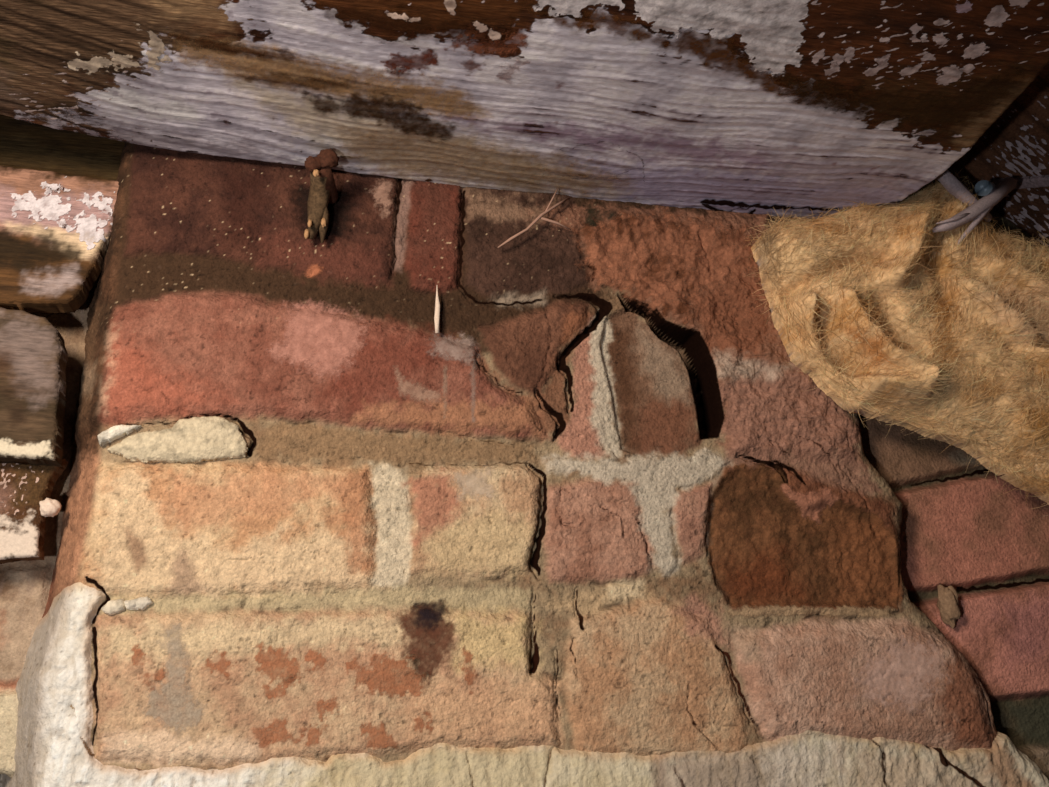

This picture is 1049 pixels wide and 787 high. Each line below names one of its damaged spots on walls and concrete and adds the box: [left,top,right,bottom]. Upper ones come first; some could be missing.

peeling [67,24,172,78]
peeling [381,49,437,76]
peeling [533,0,856,77]
peeling [900,0,986,85]
peeling [10,176,115,250]
corrosion [292,184,350,238]
crack [458,191,612,439]
crack [409,440,584,715]
leakage [416,607,444,627]
crack [80,576,110,756]
crack [873,741,887,787]
crack [926,746,985,787]